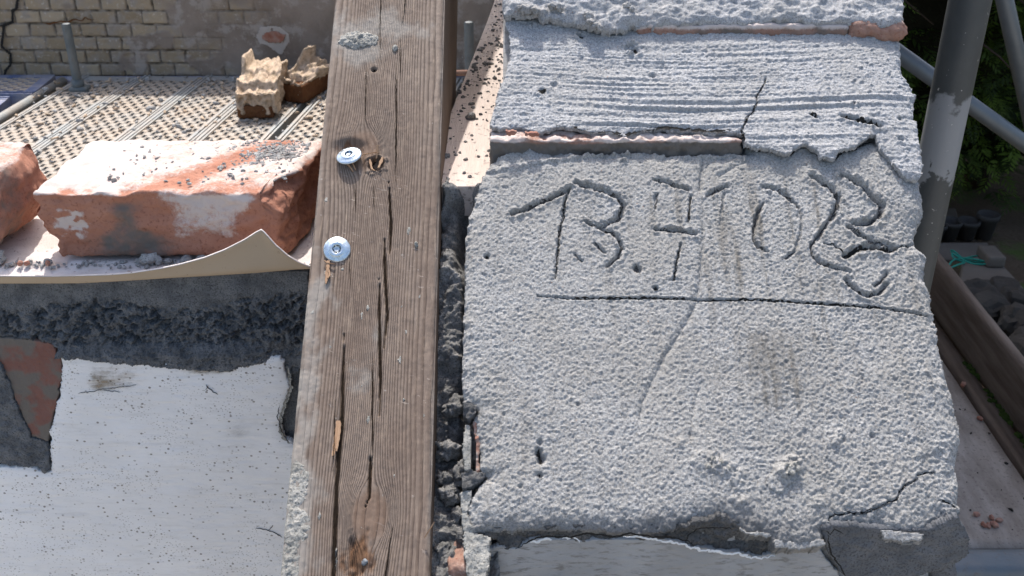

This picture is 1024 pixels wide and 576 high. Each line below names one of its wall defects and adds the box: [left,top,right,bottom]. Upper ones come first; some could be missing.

crack [559,80,871,160]
spalling [0,336,63,441]
spalling [460,402,970,576]
crack [826,472,933,576]